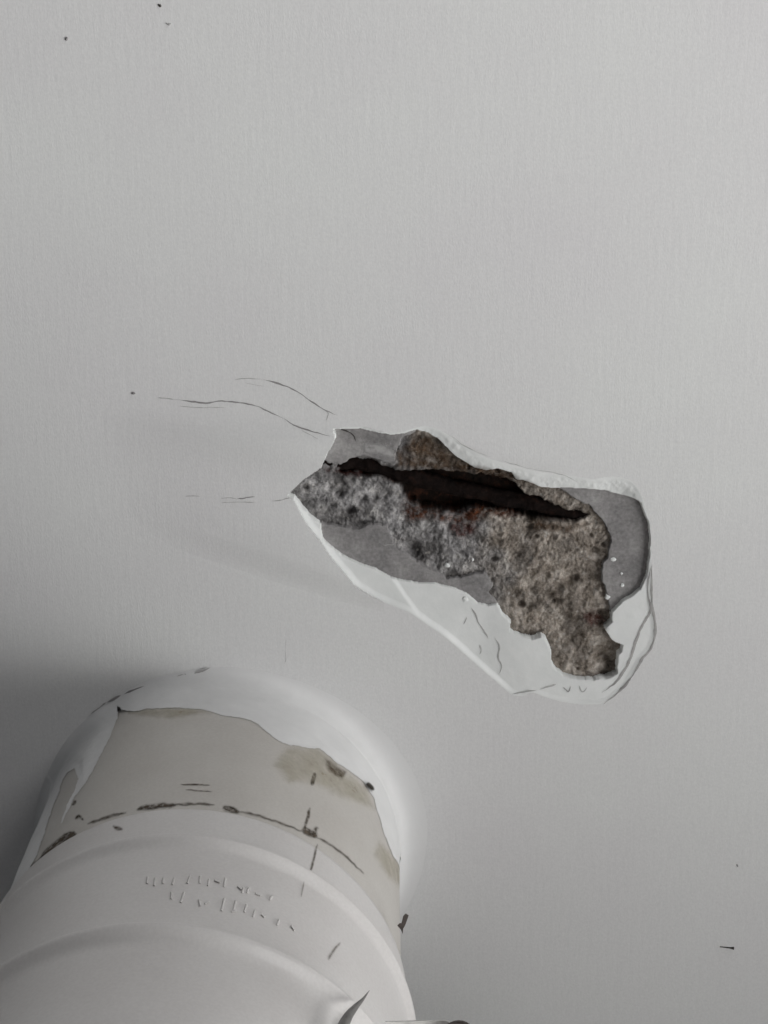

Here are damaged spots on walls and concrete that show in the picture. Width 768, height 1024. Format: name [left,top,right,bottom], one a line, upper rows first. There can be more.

crack [159,378,356,441]
rust [398,435,517,480]
spalling [288,426,654,704]